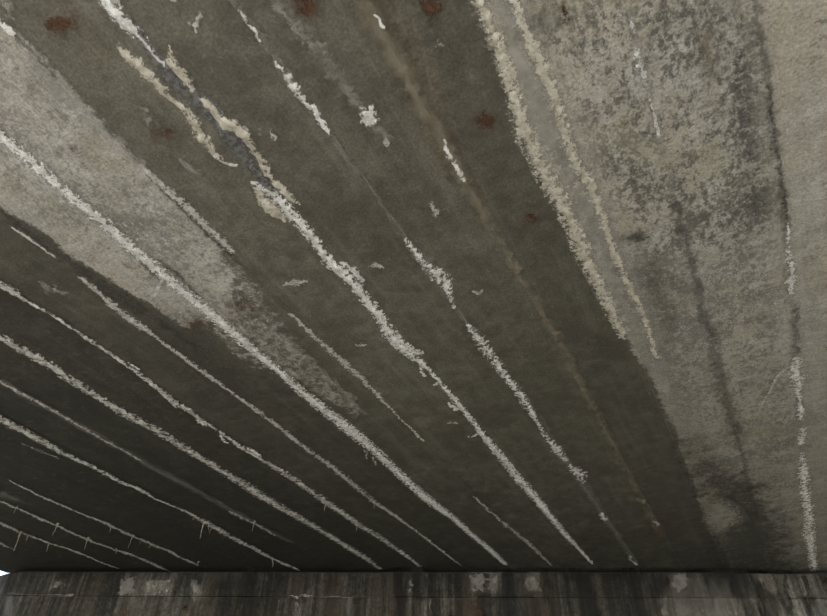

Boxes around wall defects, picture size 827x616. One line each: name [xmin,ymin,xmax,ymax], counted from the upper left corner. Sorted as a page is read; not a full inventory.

corrosion [44,16,72,31]
damp [470,0,665,370]
damp [784,223,798,294]
damp [622,357,827,616]